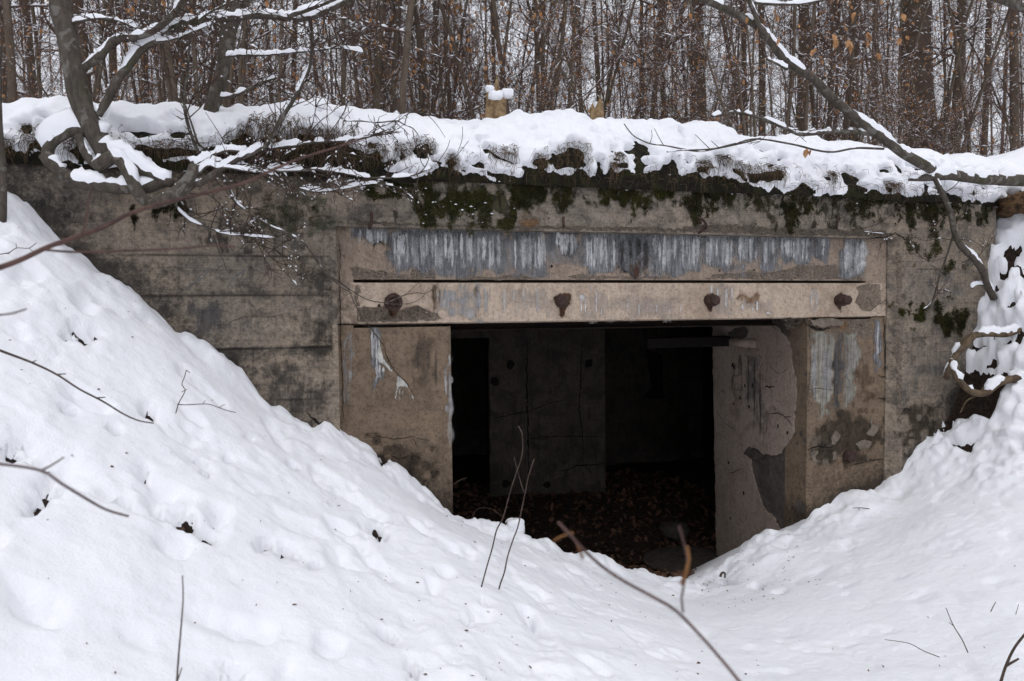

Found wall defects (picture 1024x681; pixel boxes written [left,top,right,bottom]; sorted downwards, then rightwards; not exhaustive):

damp [188,300,221,337]
damp [191,176,334,255]
spalling [355,220,888,238]
damp [351,181,993,323]
crack [492,342,604,483]
flaking render [712,284,881,556]